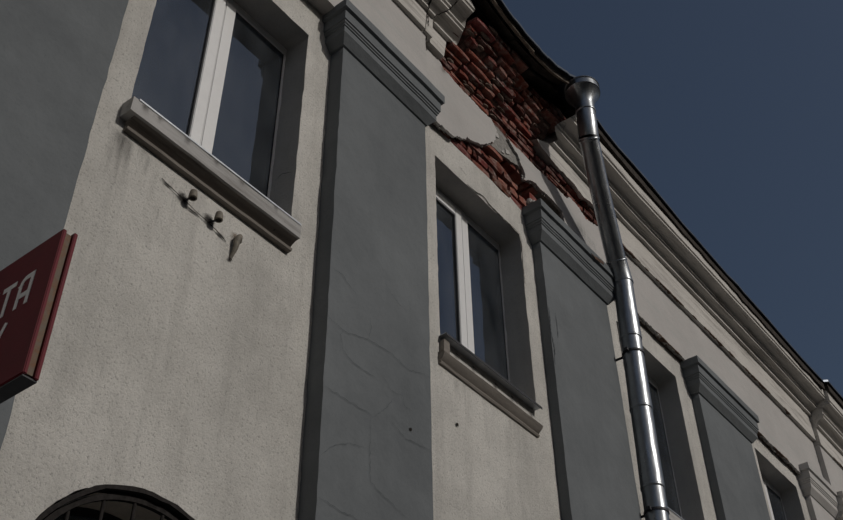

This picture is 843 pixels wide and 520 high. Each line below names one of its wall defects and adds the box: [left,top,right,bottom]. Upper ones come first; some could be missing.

crack [426,0,458,61]
spalling [432,17,598,226]